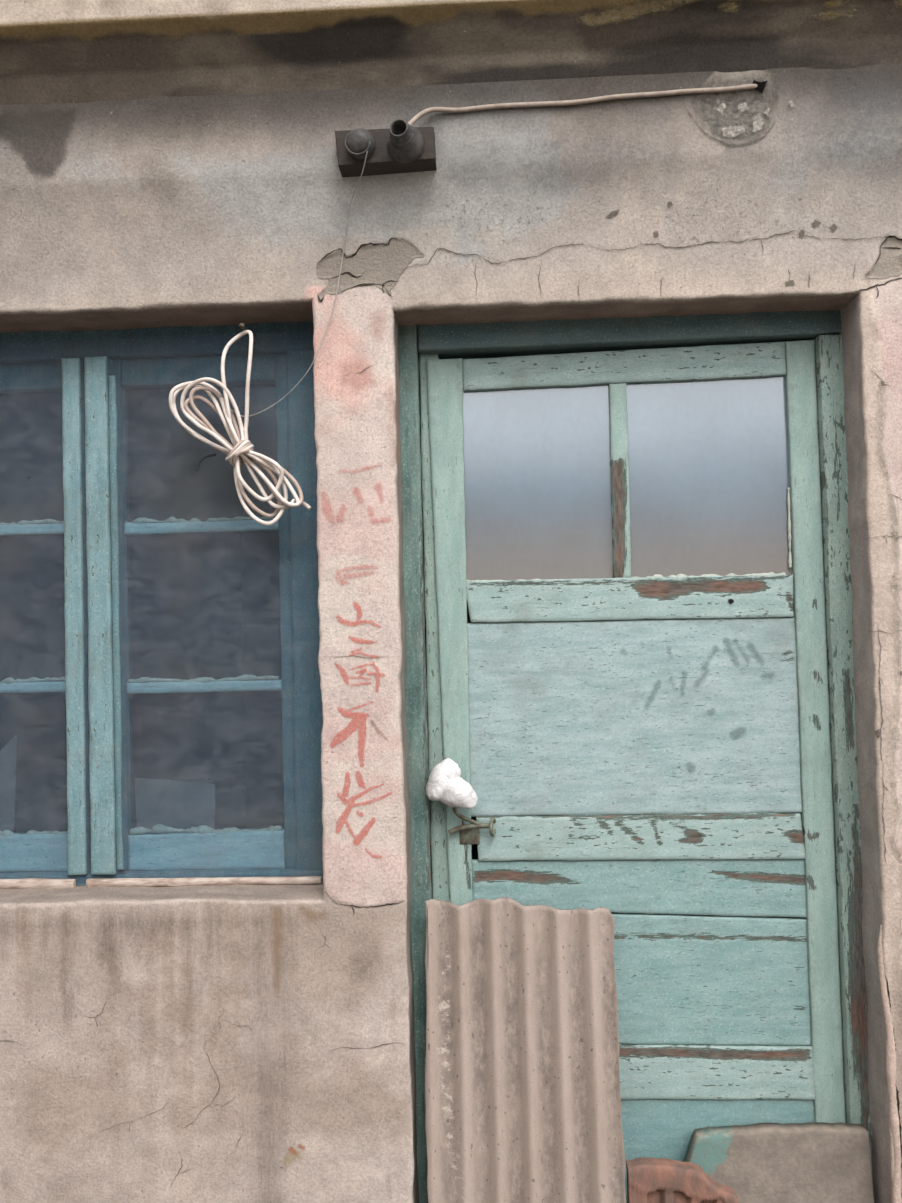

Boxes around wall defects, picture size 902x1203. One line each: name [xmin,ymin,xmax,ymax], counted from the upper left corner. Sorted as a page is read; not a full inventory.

water stain [0,112,72,174]
flaking render [316,237,424,302]
crack [410,230,902,299]
flaking render [865,236,902,279]
crack [96,1012,254,1184]